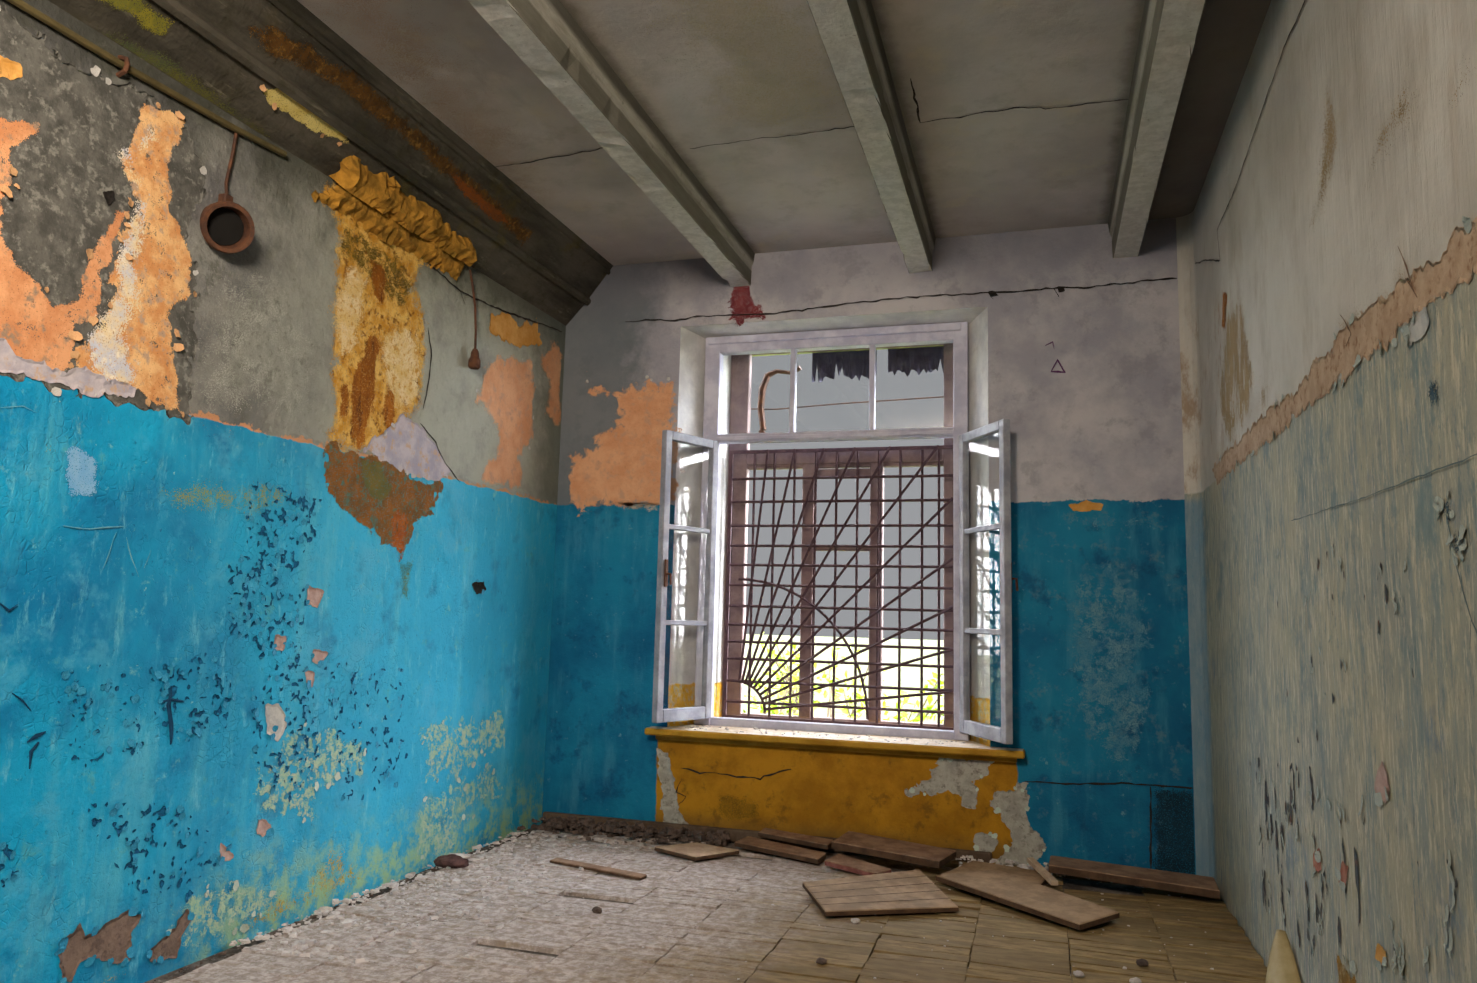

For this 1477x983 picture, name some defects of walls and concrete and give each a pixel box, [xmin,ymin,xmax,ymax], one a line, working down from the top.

peeling [0,5,207,425]
flaking render [311,155,477,281]
crack [625,0,1306,322]
peeling [1212,216,1477,485]
peeling [363,414,451,481]
peeling [568,375,686,517]
peeling [58,665,144,768]
peeling [149,479,506,859]
flaking render [54,802,234,983]
peeling [904,758,1047,866]
peeling [1249,758,1390,983]
peeling [1375,849,1457,983]